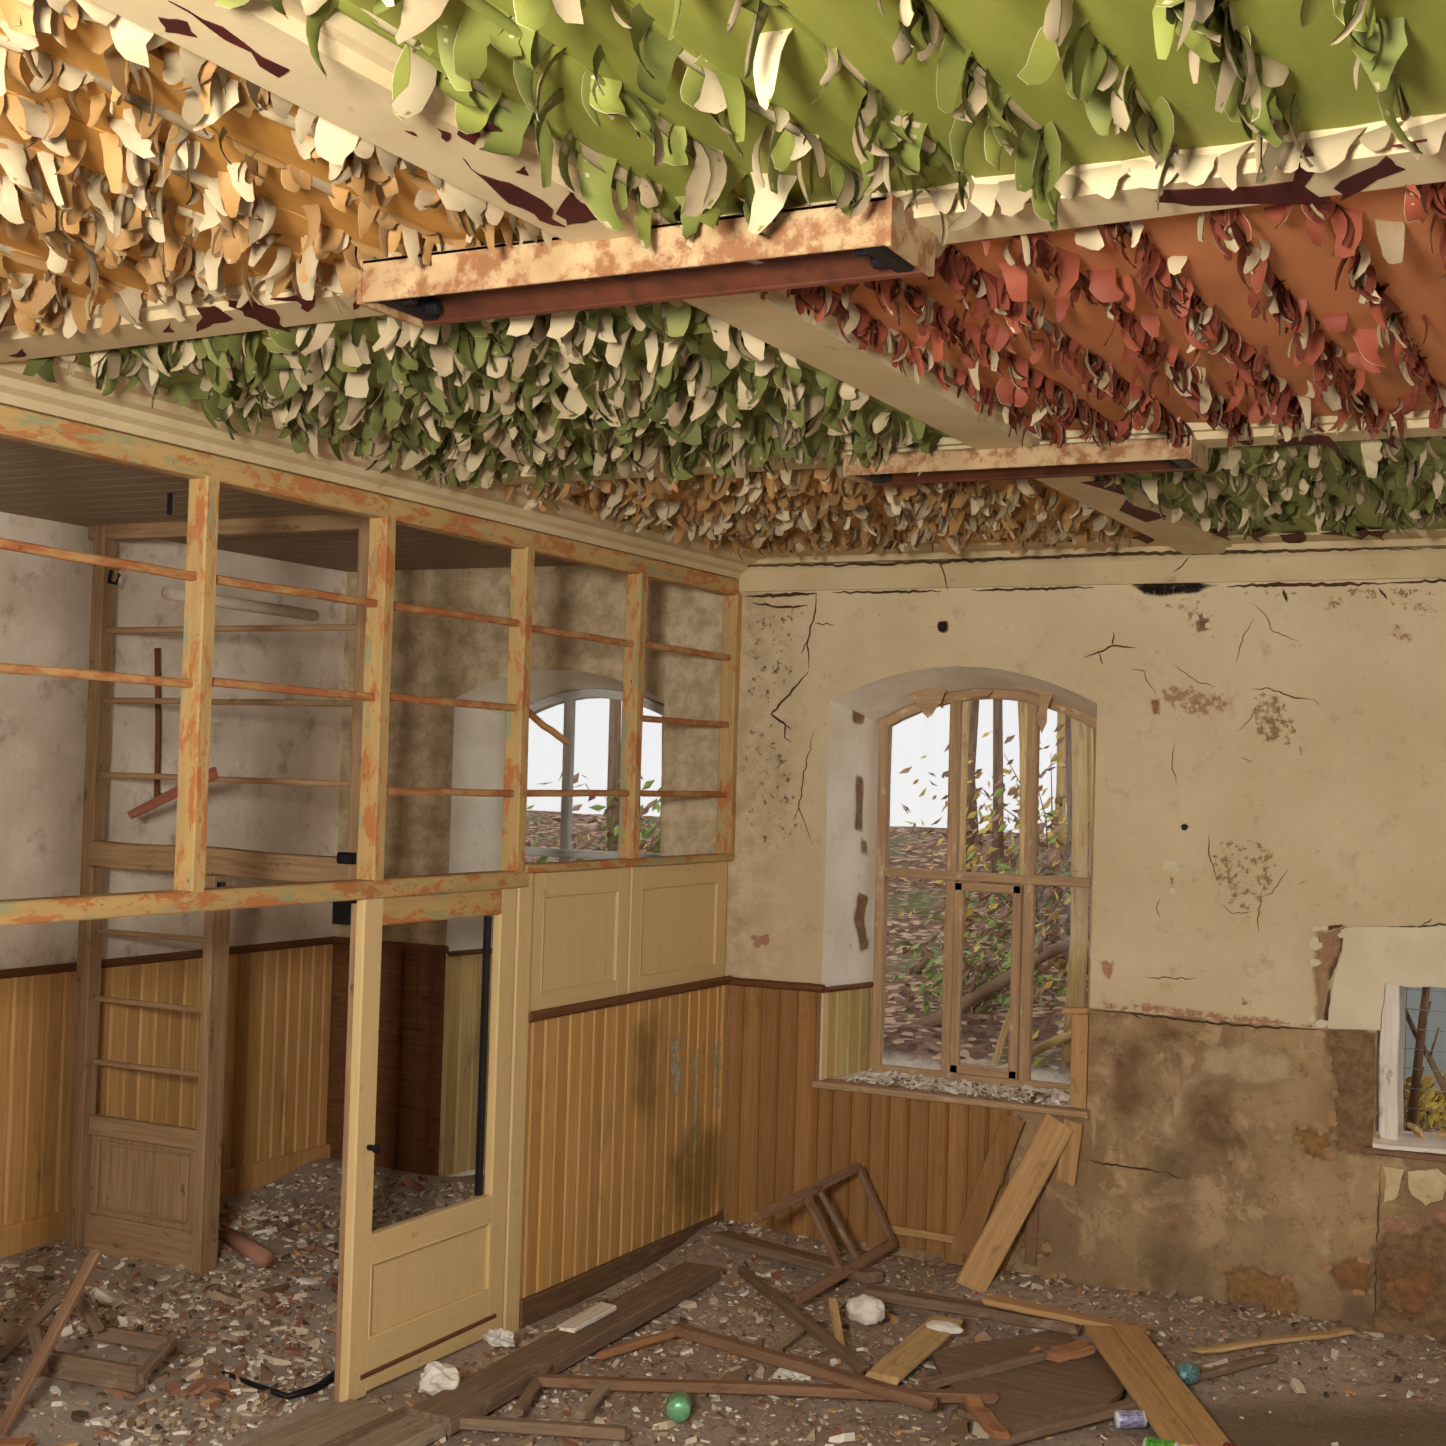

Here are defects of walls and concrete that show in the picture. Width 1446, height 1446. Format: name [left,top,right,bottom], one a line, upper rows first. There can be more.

peeling [0,0,1446,562]
crack [746,547,1446,845]
crack [1390,919,1446,927]
flaking render [1293,926,1380,1161]
flaking render [1318,1252,1374,1296]
flaking render [1383,1166,1446,1206]